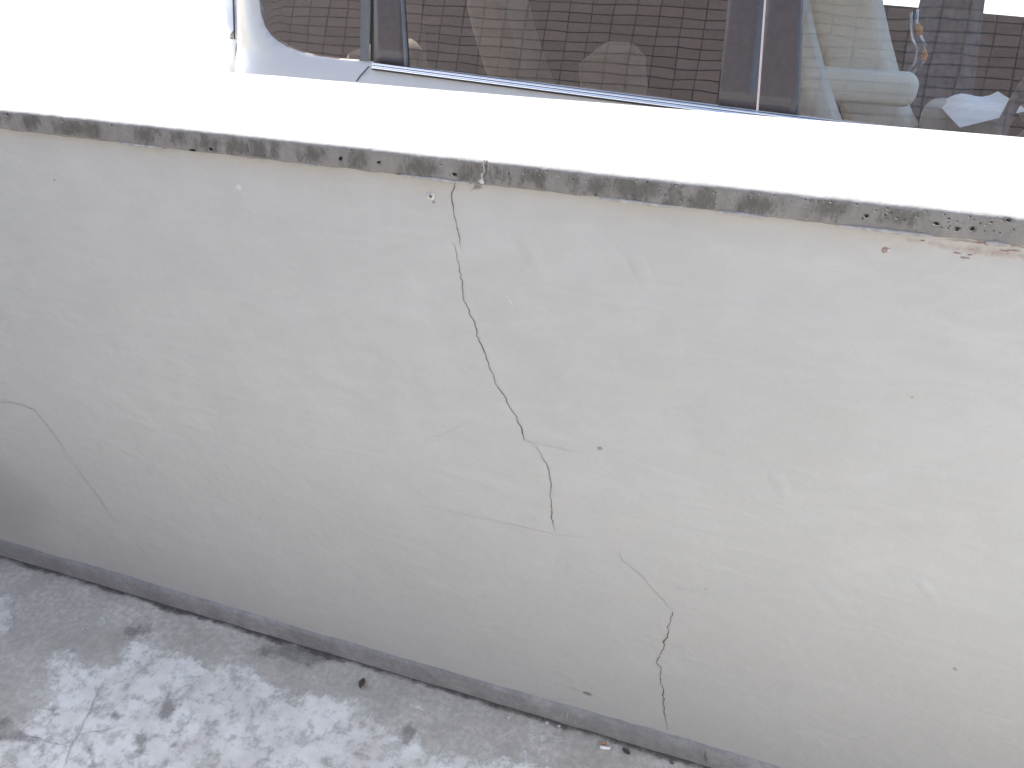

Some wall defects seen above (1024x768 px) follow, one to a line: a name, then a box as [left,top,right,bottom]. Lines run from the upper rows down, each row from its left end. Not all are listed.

crack [451,160,554,526]
crack [619,547,673,727]